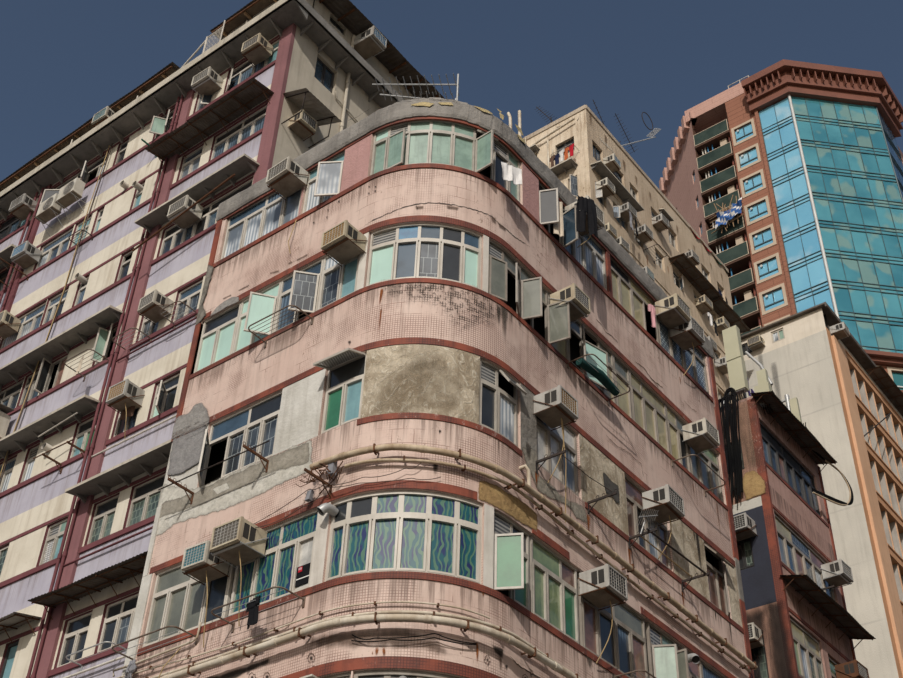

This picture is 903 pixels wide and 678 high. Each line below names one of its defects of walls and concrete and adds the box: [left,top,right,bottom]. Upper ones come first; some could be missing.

crack [370,202,530,247]
damp [387,283,512,328]
peeling [156,440,312,535]